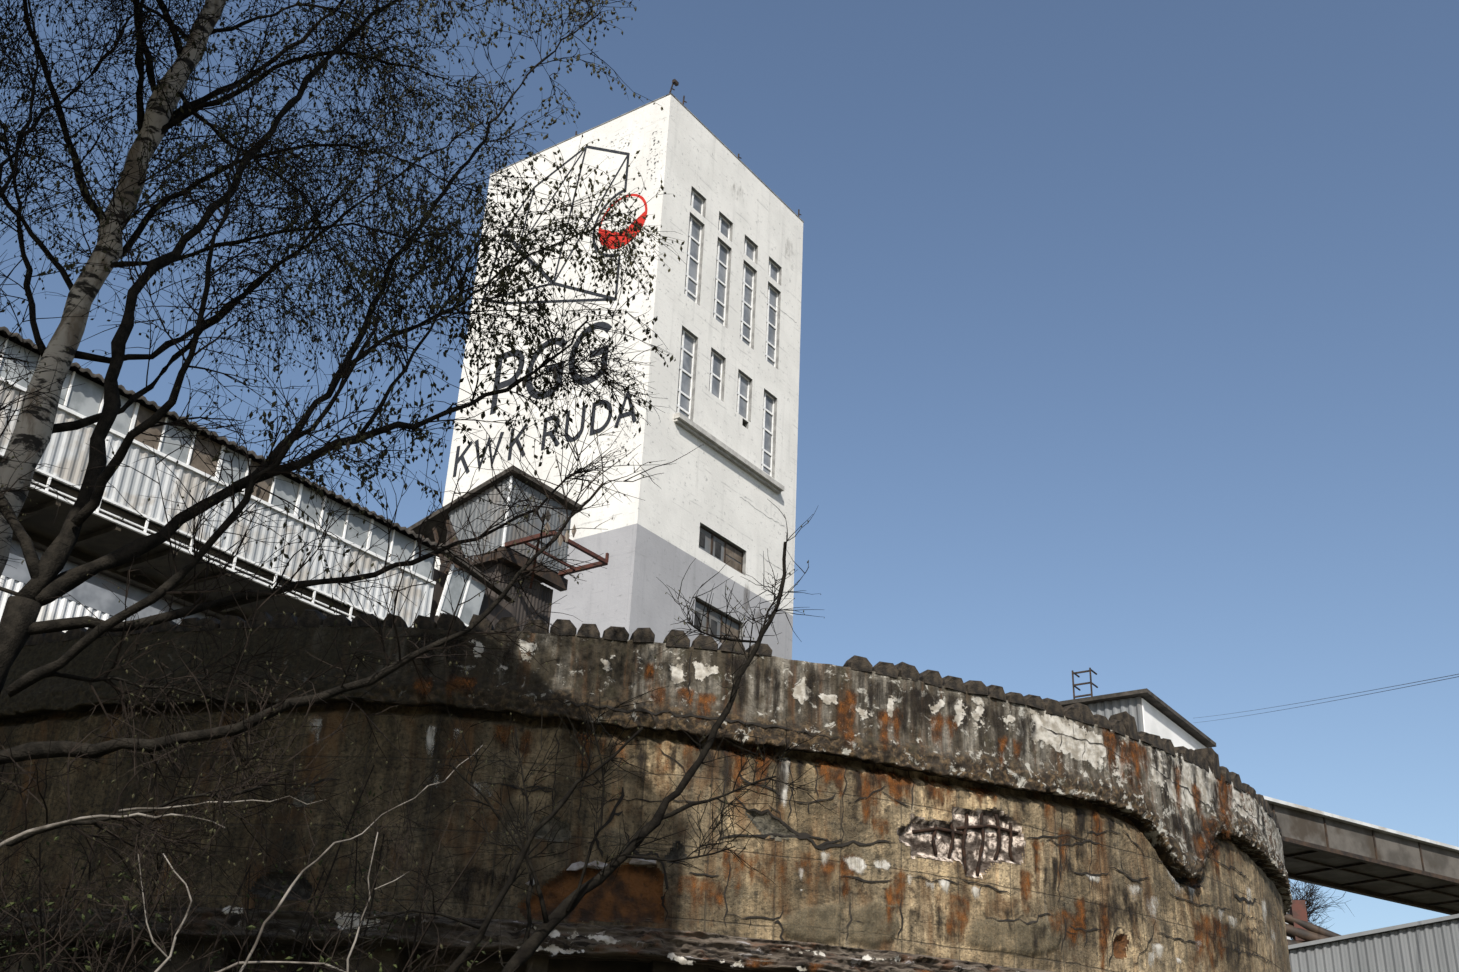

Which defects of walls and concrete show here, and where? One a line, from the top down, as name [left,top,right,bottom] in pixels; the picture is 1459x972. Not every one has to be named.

corrosion [838,691,856,740]
peeling [929,696,984,730]
peeling [1002,709,1131,779]
corrosion [1103,730,1148,782]
peeling [1148,747,1271,839]
spalling [897,806,1026,879]
spalling [517,841,687,955]
spalling [1175,877,1204,889]
peeling [667,953,693,965]
spalling [1113,933,1129,959]